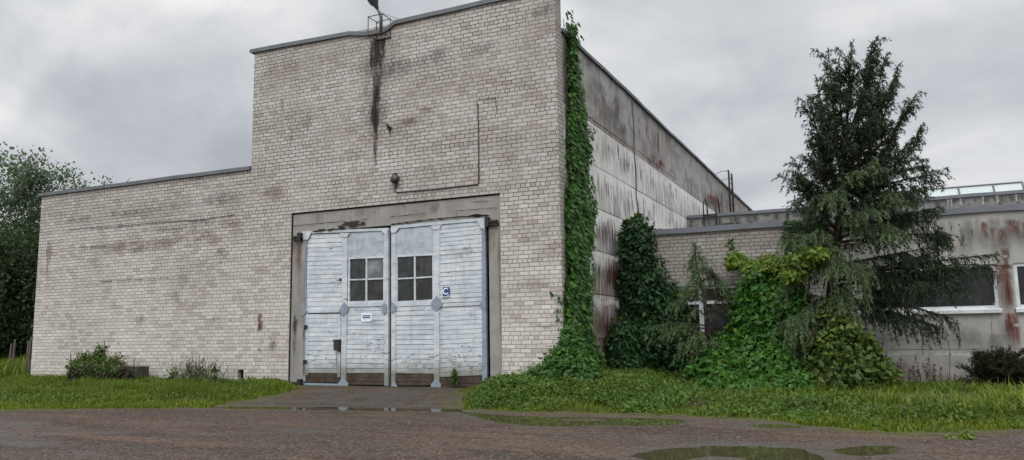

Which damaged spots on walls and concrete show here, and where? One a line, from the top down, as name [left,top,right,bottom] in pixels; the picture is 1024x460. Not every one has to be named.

damp [370,39,391,133]
spalling [317,220,366,231]
damp [596,146,685,227]
corrosion [996,250,1020,344]